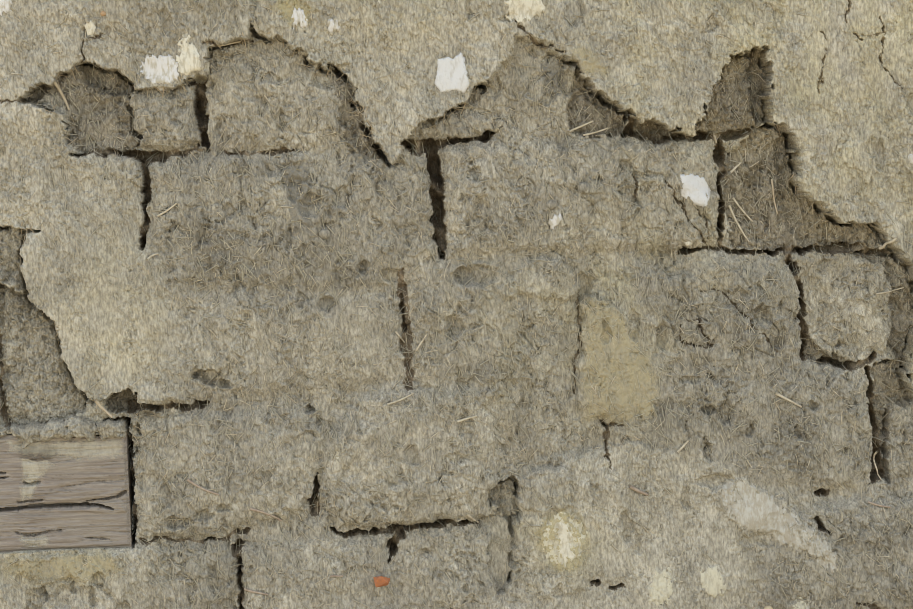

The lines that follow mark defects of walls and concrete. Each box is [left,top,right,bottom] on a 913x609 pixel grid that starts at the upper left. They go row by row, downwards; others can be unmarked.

spalling [24,63,144,153]
peeling [140,35,210,91]
spalling [315,63,387,164]
peeling [435,53,487,106]
spalling [566,62,684,143]
crack [401,130,496,260]
peeling [547,214,562,230]
peeling [680,173,711,207]
spalling [695,47,913,483]
spalling [0,226,89,430]
spalling [105,389,138,414]
crack [856,601,881,609]